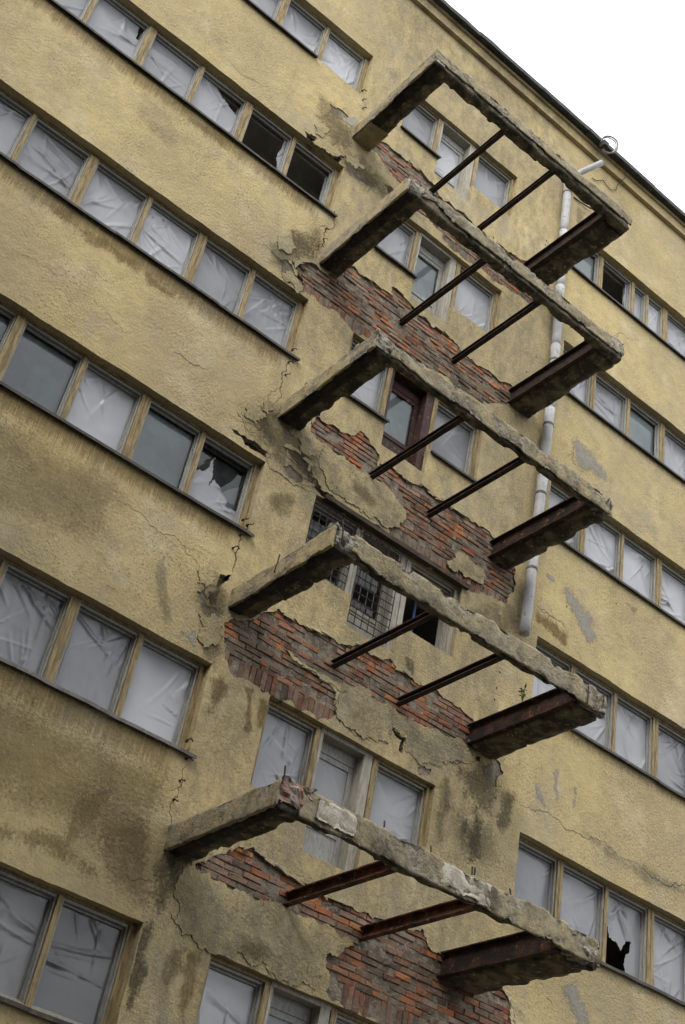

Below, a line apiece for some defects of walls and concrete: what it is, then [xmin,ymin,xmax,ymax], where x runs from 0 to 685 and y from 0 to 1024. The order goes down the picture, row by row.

flaking render [305,104,371,186]
flaking render [277,235,512,405]
flaking render [283,416,516,603]
flaking render [224,609,474,743]
crack [164,760,187,835]
leakage [497,792,514,827]
flaking render [191,842,531,1024]